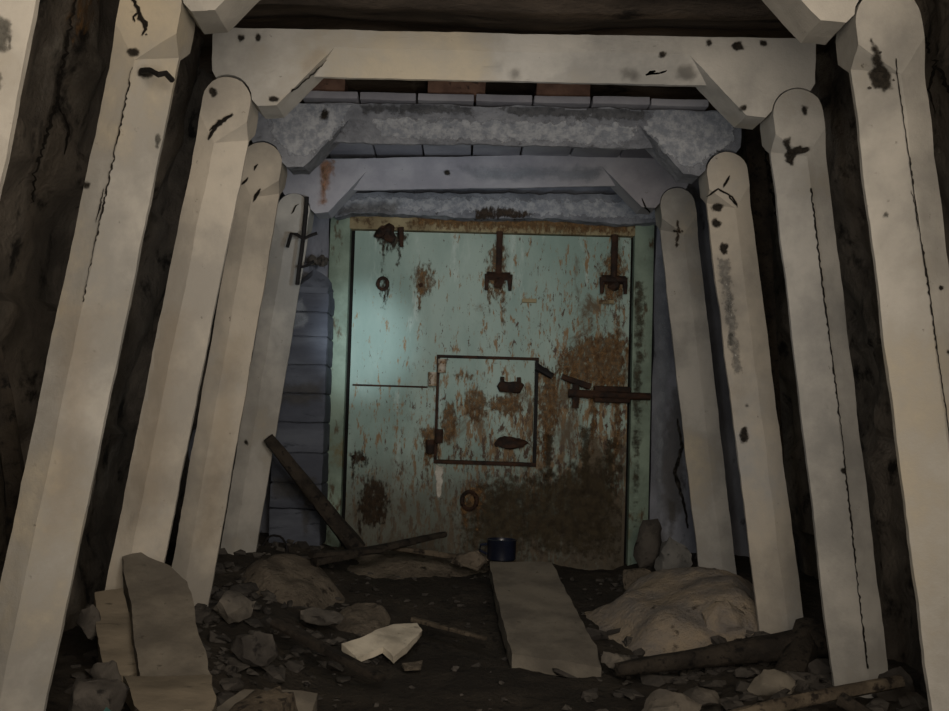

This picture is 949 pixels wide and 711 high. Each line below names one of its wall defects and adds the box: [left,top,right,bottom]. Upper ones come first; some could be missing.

crack [132,0,148,35]
spalling [868,39,895,91]
crack [208,114,233,140]
spalling [783,138,809,165]
corrosion [321,161,335,203]
crack [707,175,738,207]
corrosion [377,218,630,323]
corrosion [537,251,645,469]
corrosion [421,370,523,480]
corrosion [350,450,391,538]